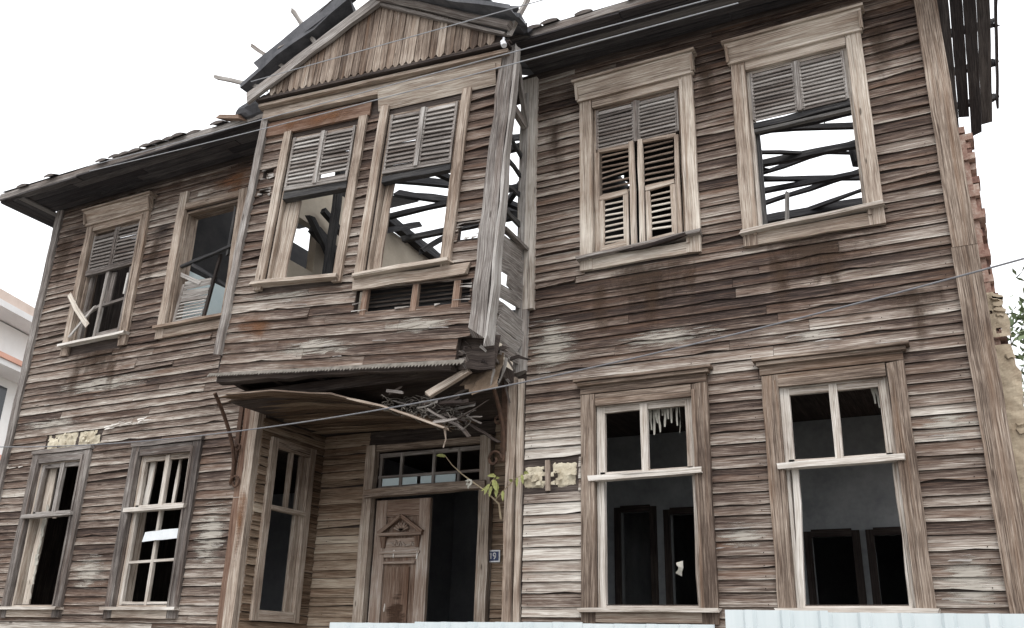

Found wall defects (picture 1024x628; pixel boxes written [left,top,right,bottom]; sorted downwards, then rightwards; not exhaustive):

flaking render [19,419,100,449]
flaking render [523,462,577,488]